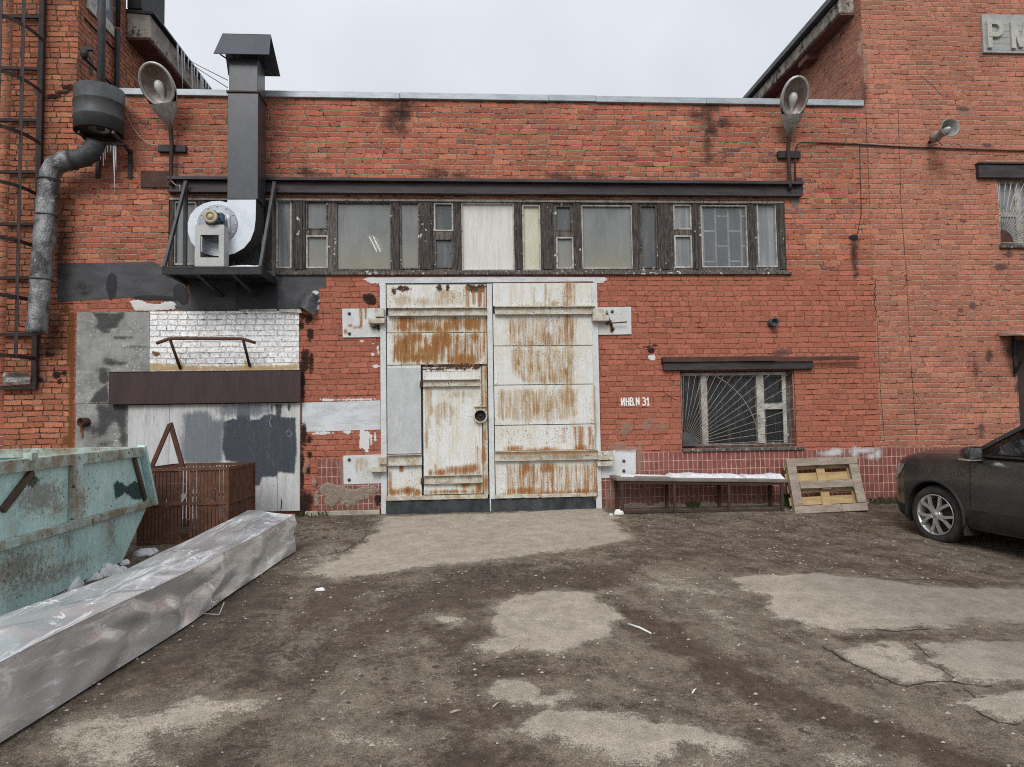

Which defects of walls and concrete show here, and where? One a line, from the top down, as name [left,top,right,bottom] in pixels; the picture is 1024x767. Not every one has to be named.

corrosion [391,282,487,411]
corrosion [499,281,577,420]
corrosion [387,385,598,497]
crack [821,628,1020,725]